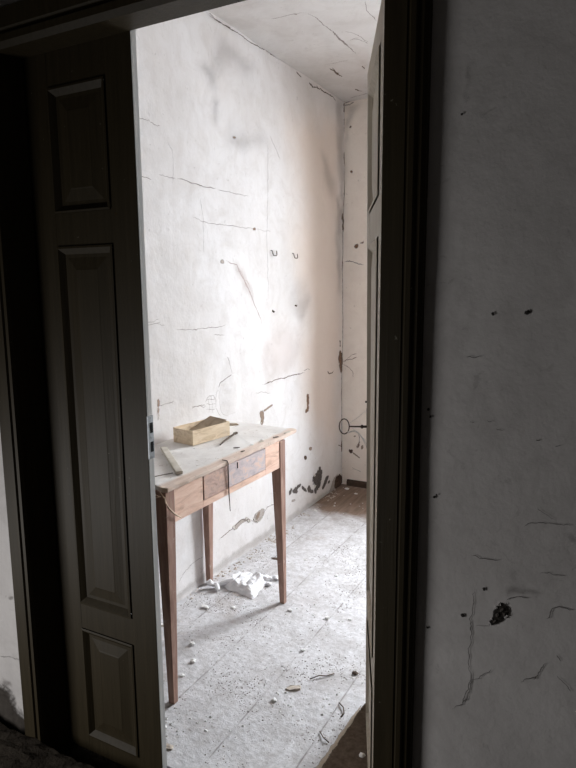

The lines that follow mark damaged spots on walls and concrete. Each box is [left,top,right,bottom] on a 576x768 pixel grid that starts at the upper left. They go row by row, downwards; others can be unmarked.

crack [211,15,275,57]
crack [273,13,367,112]
crack [142,176,271,250]
crack [339,160,347,230]
crack [262,256,362,416]
crack [455,592,491,707]
spalling [489,602,510,626]